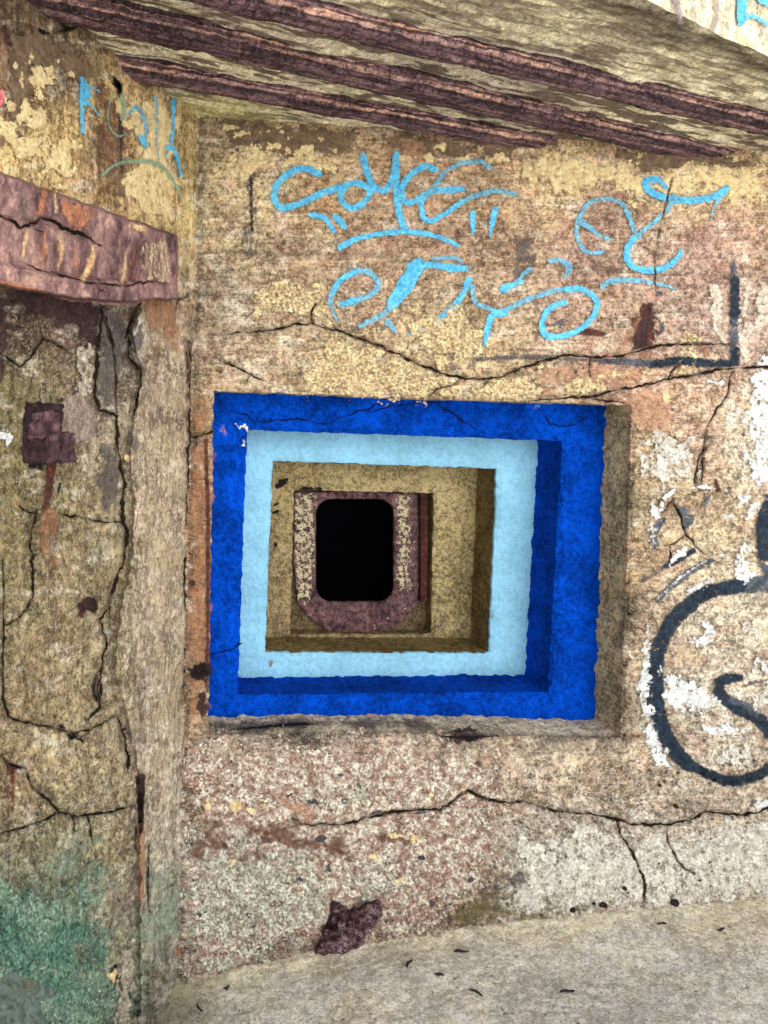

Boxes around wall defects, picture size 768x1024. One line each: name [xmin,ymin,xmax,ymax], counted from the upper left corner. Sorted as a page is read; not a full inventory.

peeling [0,23,99,190]
peeling [112,76,186,221]
rust [20,185,93,259]
rust [41,231,96,280]
crack [214,304,768,482]
rust [598,303,663,378]
peeling [662,330,724,402]
peeling [719,285,768,586]
crack [0,262,190,771]
rust [187,399,214,717]
crack [2,757,131,837]
crack [293,789,768,908]